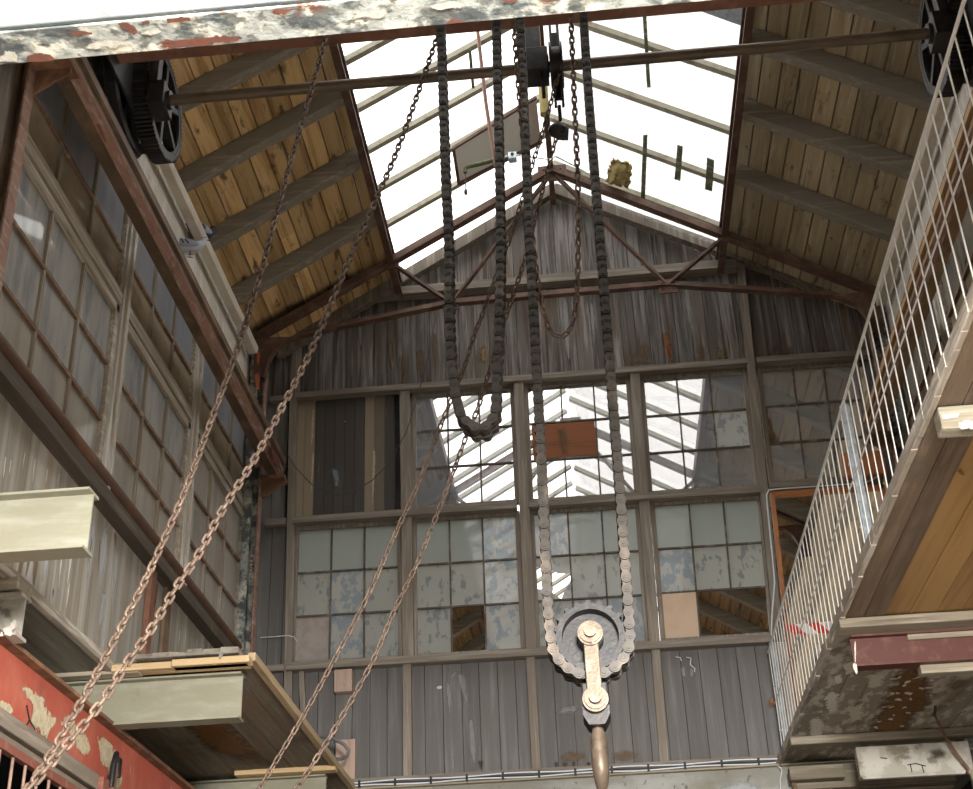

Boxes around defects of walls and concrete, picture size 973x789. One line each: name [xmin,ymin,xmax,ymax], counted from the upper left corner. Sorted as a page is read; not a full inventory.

rust [118,21,150,35]
rust [163,35,243,49]
peeling [941,413,973,429]
peeling [808,662,865,736]
peeling [865,673,934,729]
peeling [22,687,122,788]